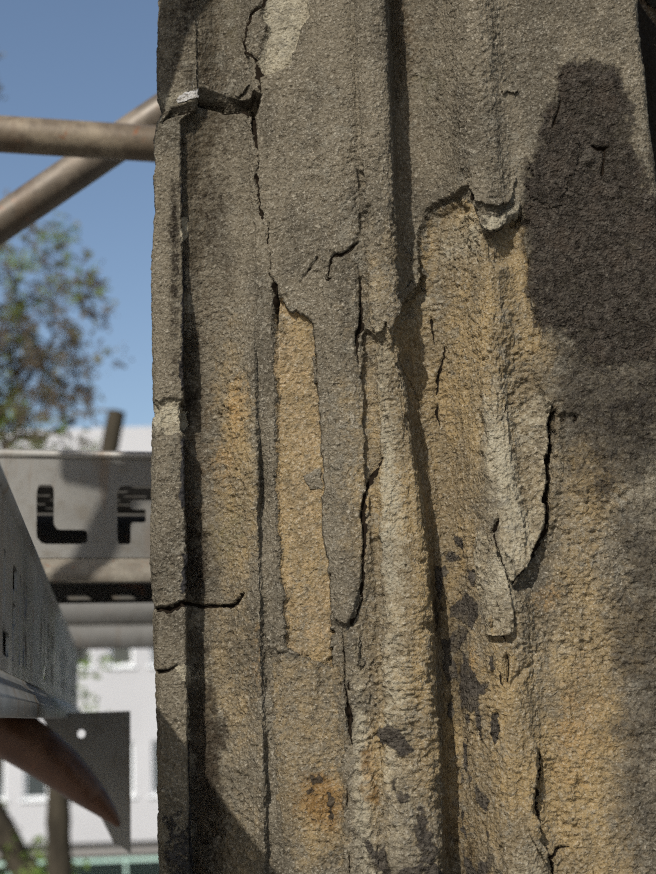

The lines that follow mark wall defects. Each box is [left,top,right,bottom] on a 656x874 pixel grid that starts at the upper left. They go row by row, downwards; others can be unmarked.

crack [242,0,267,91]
crack [175,106,280,325]
crack [299,243,358,283]
crack [356,281,365,364]
spalling [369,162,552,636]
crack [491,411,577,580]
crack [156,593,245,613]
spalling [271,296,362,874]
crack [342,457,383,744]
peeling [521,730,548,863]
crack [534,753,569,874]